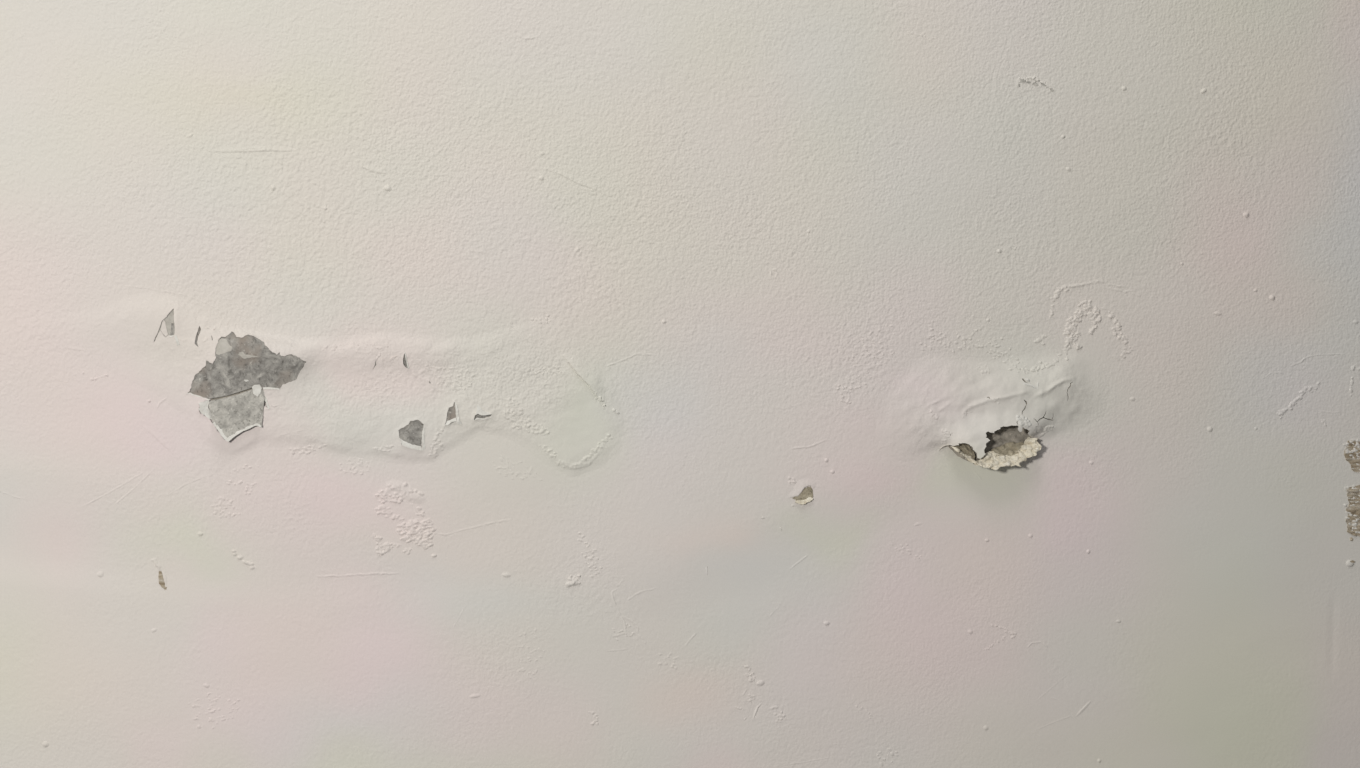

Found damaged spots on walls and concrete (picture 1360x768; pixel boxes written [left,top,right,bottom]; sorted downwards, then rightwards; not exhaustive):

peeling [187,332,306,442]
peeling [445,401,462,426]
peeling [399,420,425,451]
spalling [788,476,817,508]
spalling [1343,439,1360,536]